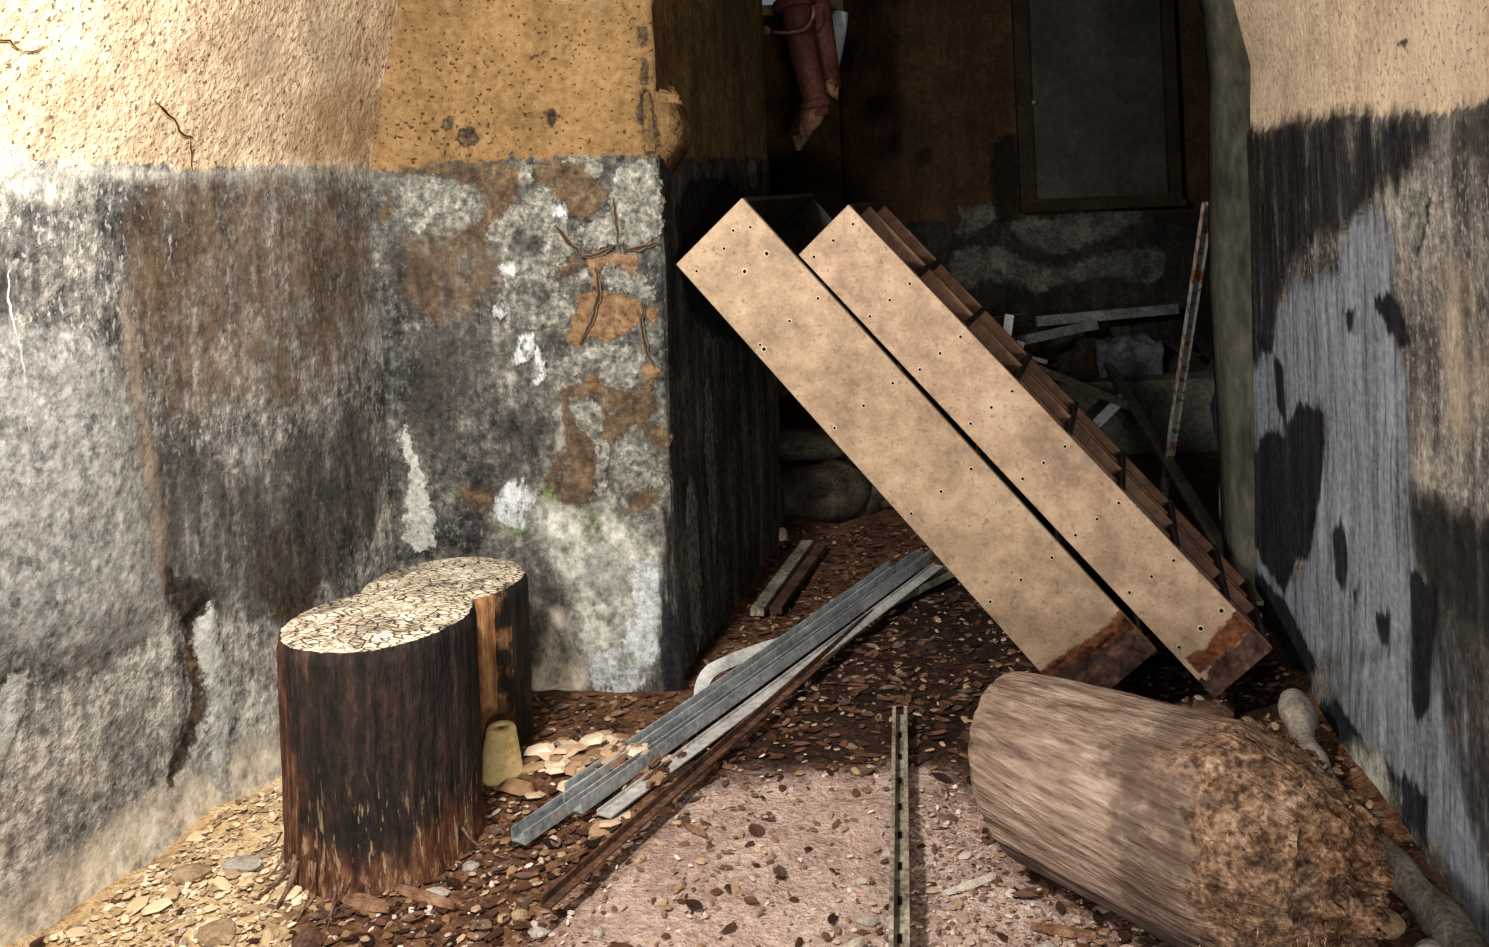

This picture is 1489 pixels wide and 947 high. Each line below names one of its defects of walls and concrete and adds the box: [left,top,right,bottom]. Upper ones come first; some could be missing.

damp [0,269,8,320]
damp [131,185,383,404]
peeling [378,26,672,547]
damp [514,226,540,256]
damp [8,447,44,489]
damp [165,404,378,620]
damp [531,375,718,693]
damp [1199,106,1489,947]
damp [0,740,282,947]